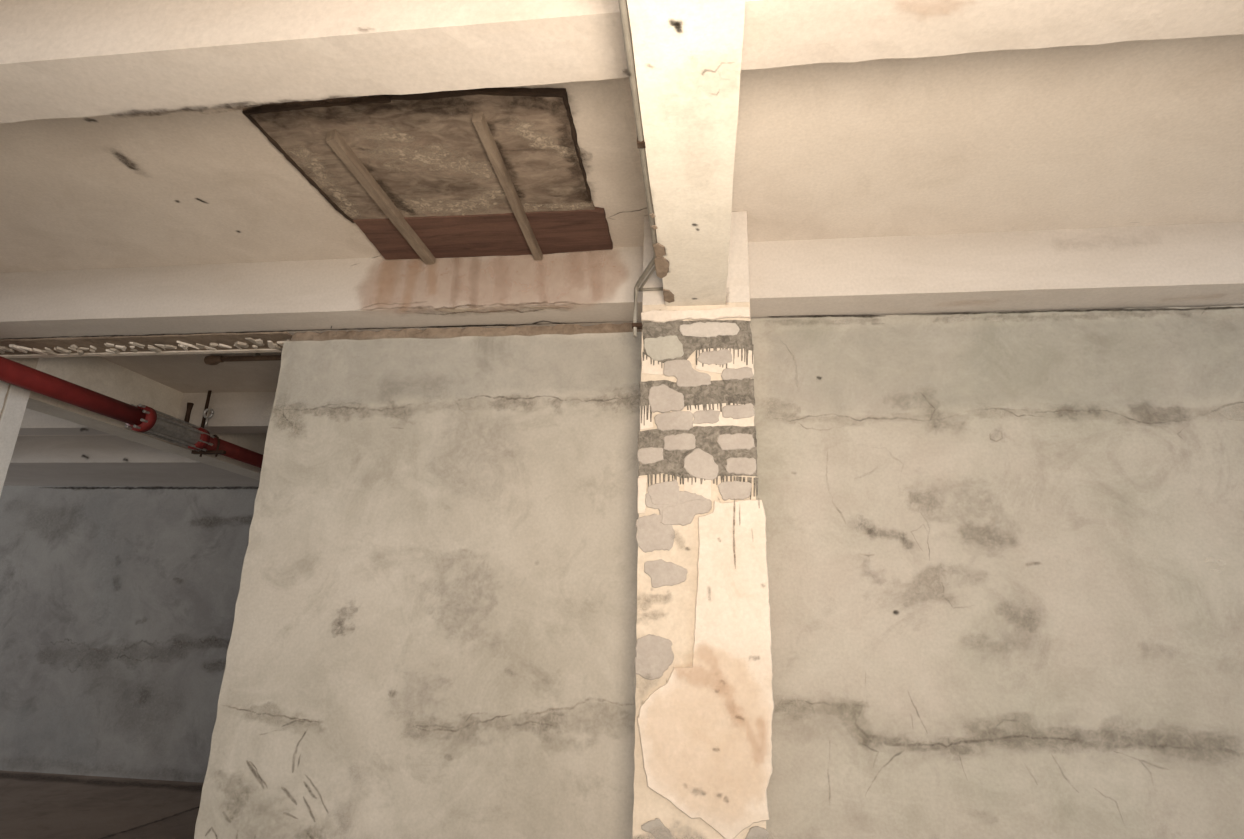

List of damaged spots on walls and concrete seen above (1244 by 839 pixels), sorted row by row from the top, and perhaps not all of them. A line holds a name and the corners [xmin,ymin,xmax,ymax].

peeling [637,500,774,839]